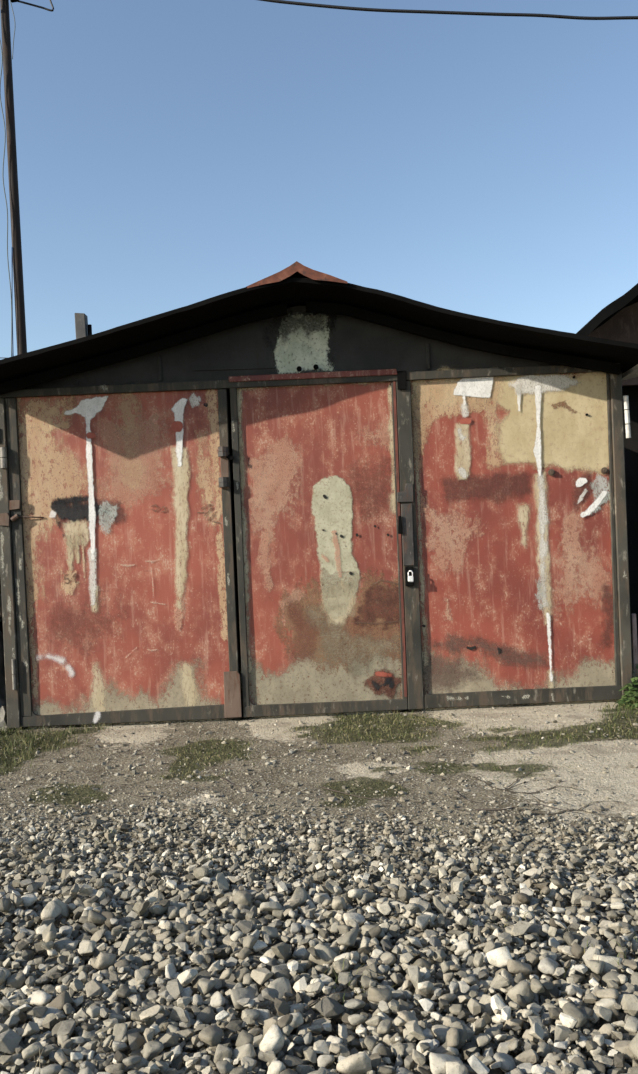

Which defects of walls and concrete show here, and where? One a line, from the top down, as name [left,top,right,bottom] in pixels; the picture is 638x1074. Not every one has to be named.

peeling [241,476,402,719]
rust [354,580,405,630]
peeling [30,663,228,729]
rust [364,669,402,698]
peeling [419,649,620,712]